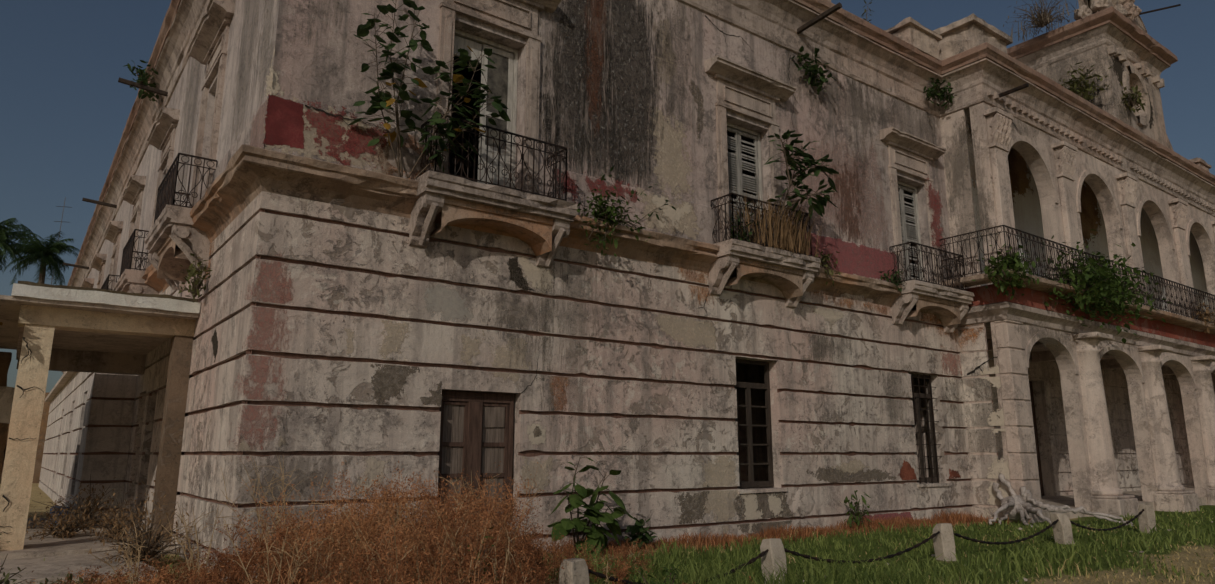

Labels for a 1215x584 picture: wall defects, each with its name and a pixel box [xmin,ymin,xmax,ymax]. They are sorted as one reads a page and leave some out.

peeling [263,37,397,174]
leakage [540,0,695,185]
flaking render [507,256,554,293]
crack [17,337,44,398]
flaking render [362,314,423,405]
flaking render [674,455,793,537]
flaking render [806,457,917,483]